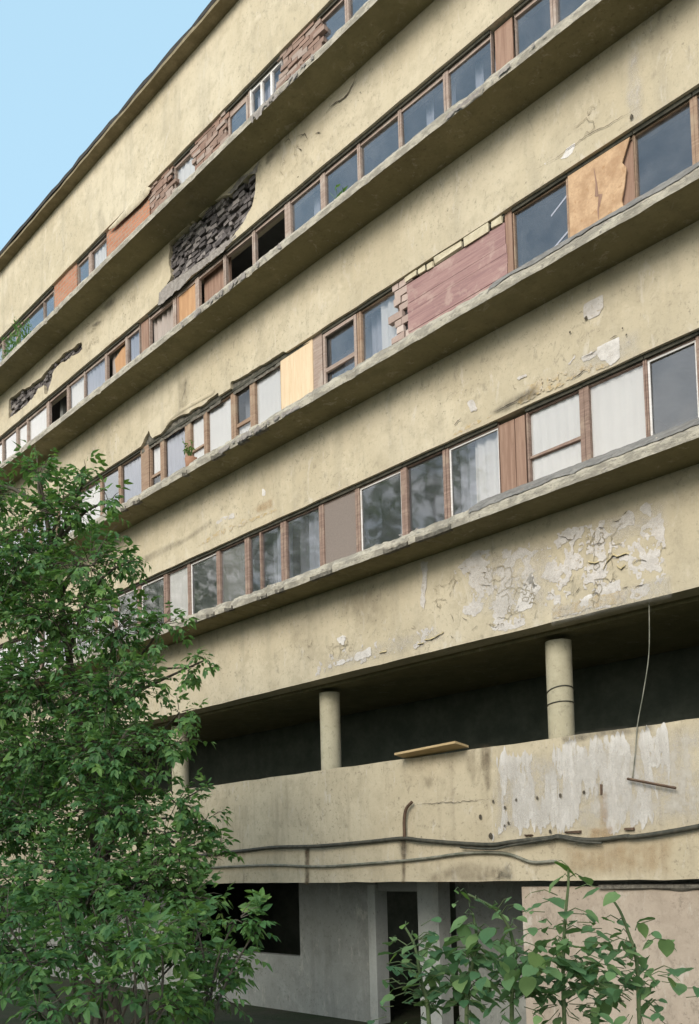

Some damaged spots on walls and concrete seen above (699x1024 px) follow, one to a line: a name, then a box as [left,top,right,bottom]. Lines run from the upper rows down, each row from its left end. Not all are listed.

flaking render [158,162,259,305]
peeling [583,295,603,320]
flaking render [10,344,82,417]
peeling [517,337,620,404]
peeling [454,502,666,632]
peeling [315,626,433,676]
peeling [492,722,670,841]